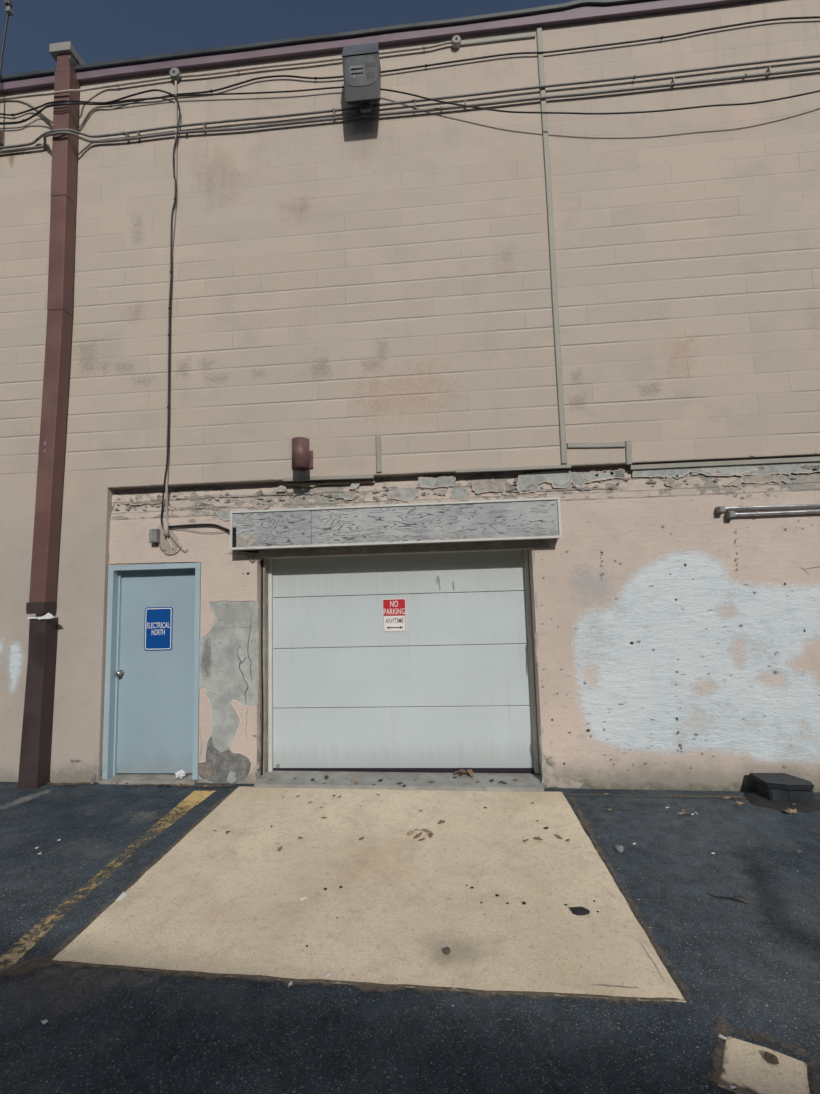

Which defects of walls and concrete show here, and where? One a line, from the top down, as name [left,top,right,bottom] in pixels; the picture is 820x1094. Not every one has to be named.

peeling [115,481,238,523]
peeling [254,479,360,504]
peeling [372,452,820,503]
flaking render [198,599,260,784]
crack [237,618,252,739]